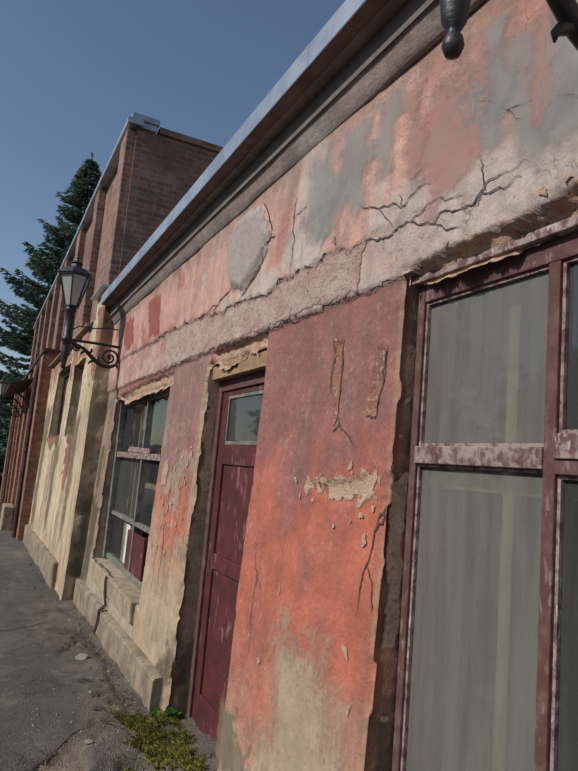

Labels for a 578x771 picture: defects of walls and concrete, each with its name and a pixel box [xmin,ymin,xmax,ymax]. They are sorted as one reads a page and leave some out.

crack [117,156,530,389]
peeling [124,316,134,351]
peeling [160,446,192,487]
flaking render [294,460,381,523]
peeling [176,508,207,675]
peeling [382,472,409,649]
leakage [216,703,249,771]